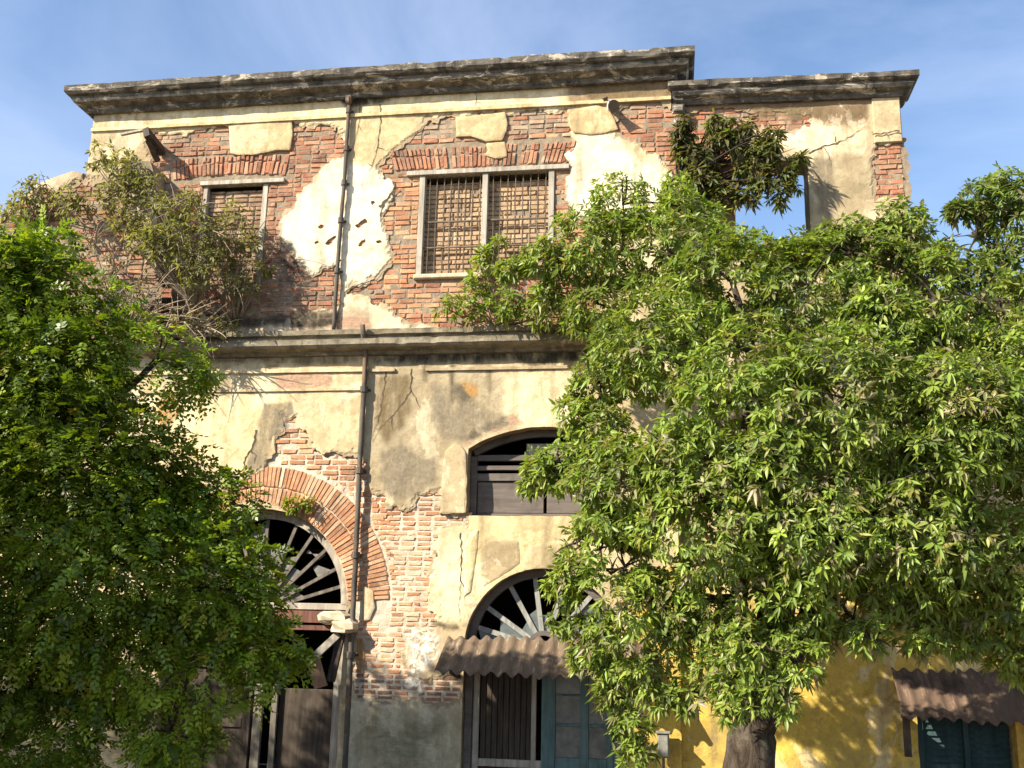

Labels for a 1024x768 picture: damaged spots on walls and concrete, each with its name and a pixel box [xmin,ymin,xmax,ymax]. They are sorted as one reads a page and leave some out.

crack [809,126,900,161]
flaking render [871,138,912,201]
flaking render [148,109,602,328]
crack [371,369,420,442]
leakage [378,377,434,496]
leakage [374,352,591,439]
flaking render [234,414,472,704]